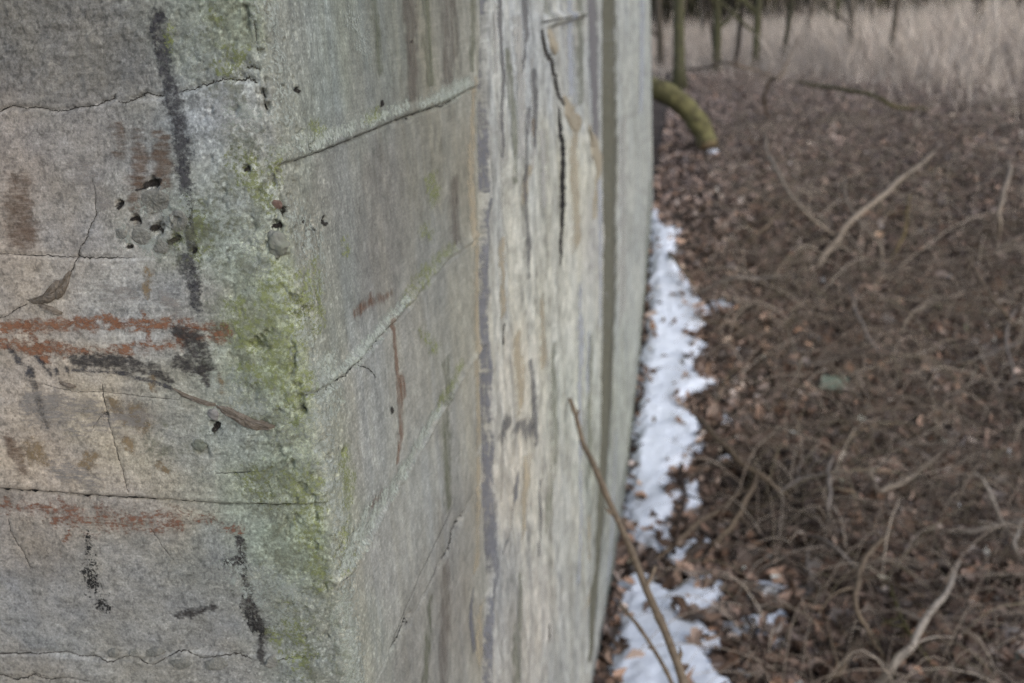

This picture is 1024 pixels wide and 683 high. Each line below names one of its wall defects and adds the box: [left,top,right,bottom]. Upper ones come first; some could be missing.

crack [0,16,261,112]
damp [7,8,224,452]
corrosion [0,310,233,364]
corrosion [390,321,405,402]
damp [21,442,98,486]
crack [3,383,180,499]
damp [174,605,217,619]
damp [224,536,269,662]
crack [0,649,251,681]